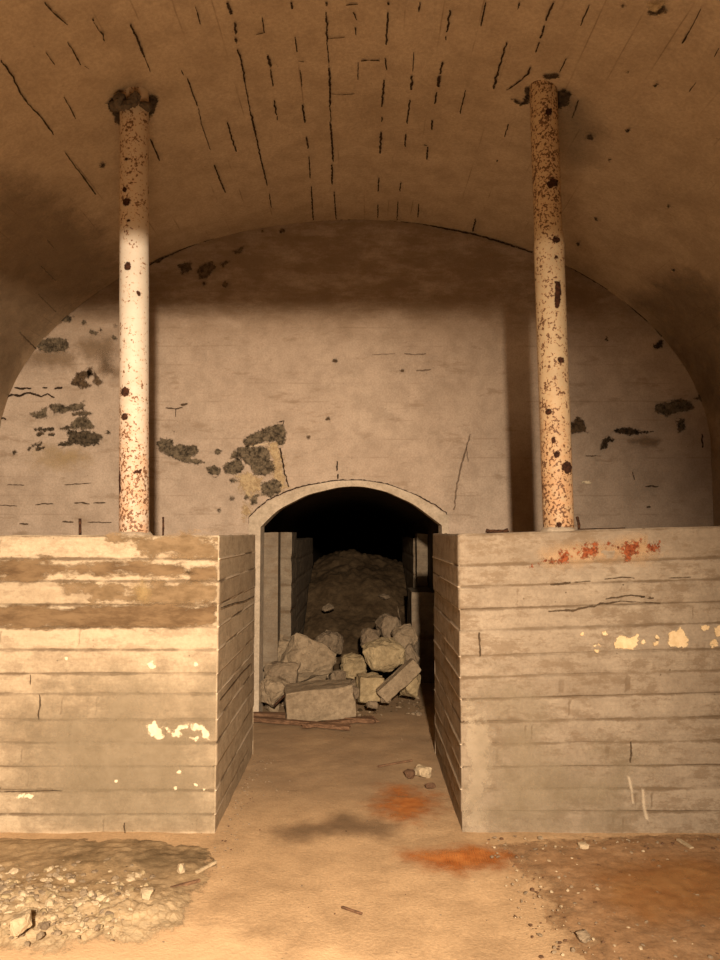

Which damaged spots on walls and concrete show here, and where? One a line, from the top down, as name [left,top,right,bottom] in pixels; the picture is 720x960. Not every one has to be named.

spalling [106,91,159,125]
crack [181,3,278,208]
crack [295,2,532,253]
spalling [37,337,69,353]
crack [1,387,62,420]
spalling [12,368,111,454]
spalling [571,417,586,434]
spalling [156,424,289,519]
crack [229,436,470,517]
rust [529,539,661,569]
crack [548,577,660,612]
peeling [594,627,689,653]